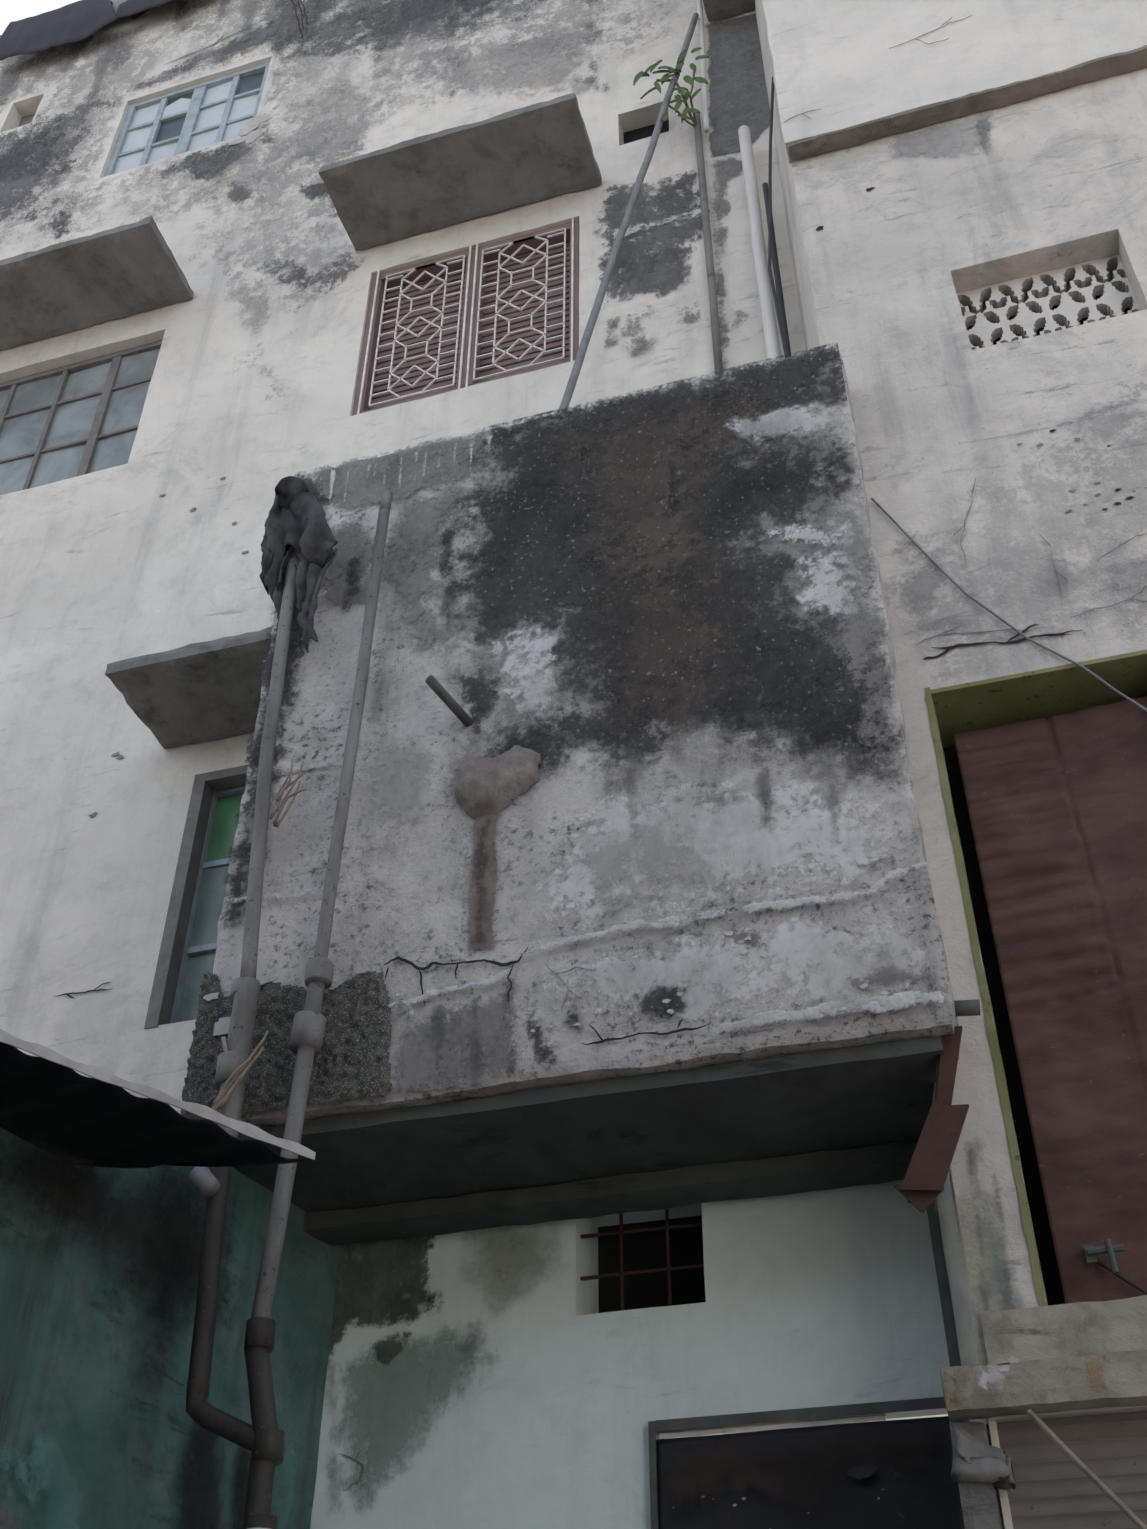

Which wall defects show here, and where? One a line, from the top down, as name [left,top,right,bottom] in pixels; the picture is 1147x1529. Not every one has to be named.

leakage [0,0,609,238]
leakage [240,253,362,327]
leakage [295,157,905,883]
crack [916,533,1147,659]
leakage [220,593,311,925]
corrosion [462,814,498,950]
leakage [548,805,710,916]
spalling [180,971,233,1119]
spalling [242,968,392,1115]
crack [383,947,711,1045]
leakage [374,1332,411,1364]
peeling [0,1436,50,1501]